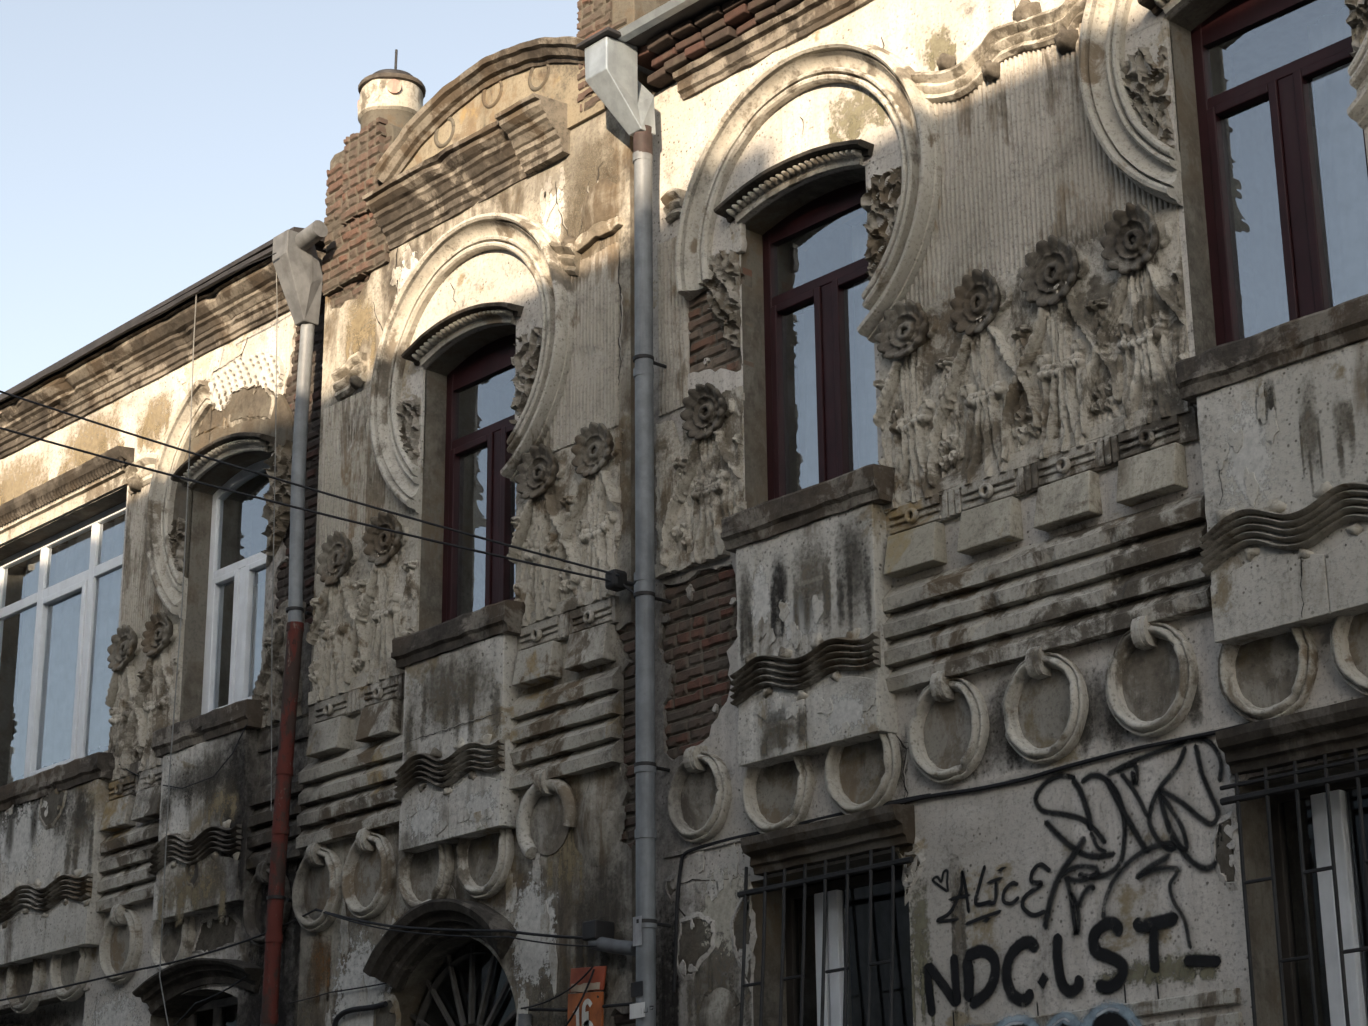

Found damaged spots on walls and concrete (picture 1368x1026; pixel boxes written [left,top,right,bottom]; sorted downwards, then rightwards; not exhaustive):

flaking render [687,290,754,373]
spalling [178,274,370,624]
water stain [1258,386,1274,425]
water stain [1300,396,1355,487]
flaking render [660,550,824,759]
water stain [740,578,753,654]
water stain [771,524,871,650]
water stain [760,711,806,758]
water stain [0,798,44,851]
water stain [54,790,93,874]
peeling [663,843,757,994]